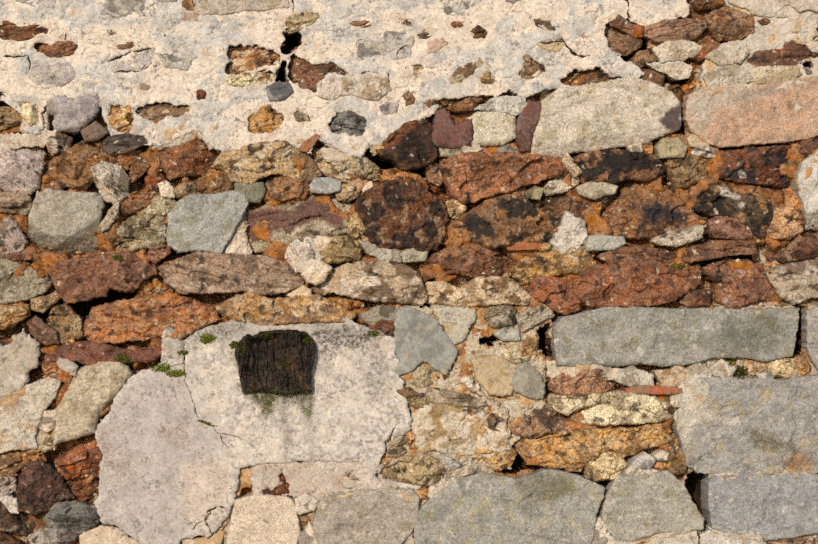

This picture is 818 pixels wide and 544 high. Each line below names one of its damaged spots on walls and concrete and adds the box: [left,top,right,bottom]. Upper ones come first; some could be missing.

flaking render [727,0,818,26]
spalling [266,33,300,101]
spalling [480,71,496,84]
spalling [379,91,416,115]
spalling [674,122,717,159]
spalling [157,181,175,198]
spalling [98,201,120,233]
spalling [443,198,467,220]
spalling [697,255,753,266]
spalling [68,291,133,322]
crack [184,357,243,447]
water stain [253,391,312,416]